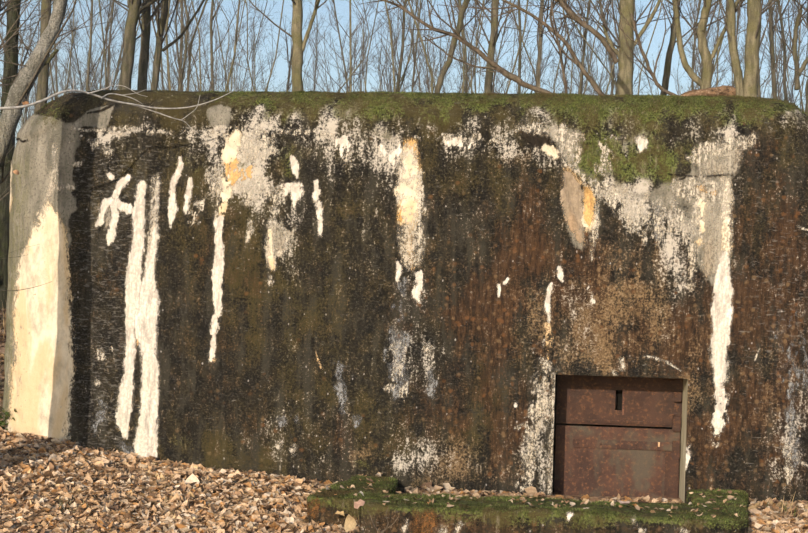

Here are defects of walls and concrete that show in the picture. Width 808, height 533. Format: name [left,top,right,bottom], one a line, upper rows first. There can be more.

damp [438,133,510,149]
spalling [541,143,559,160]
spalling [560,169,585,243]
peeling [6,201,75,441]
damp [95,126,352,460]
damp [384,277,410,401]
damp [426,369,438,396]
damp [515,358,555,494]
damp [515,122,756,447]